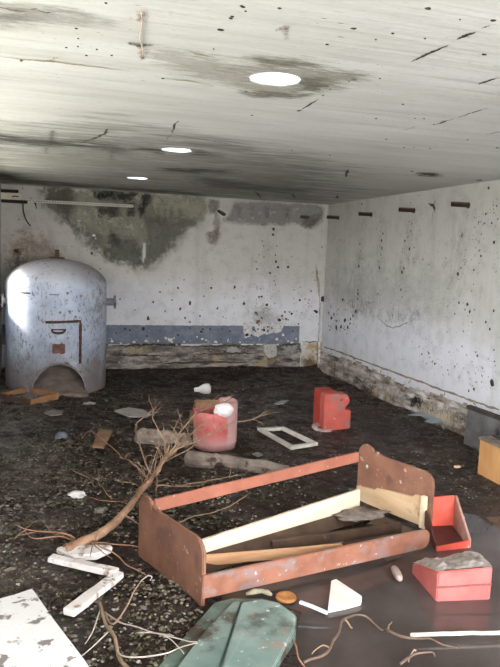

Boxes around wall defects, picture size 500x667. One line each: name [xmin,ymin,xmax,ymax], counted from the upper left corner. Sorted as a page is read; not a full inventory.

crack [412,25,489,62]
damp [154,51,365,98]
damp [0,136,119,151]
spalling [106,287,468,436]